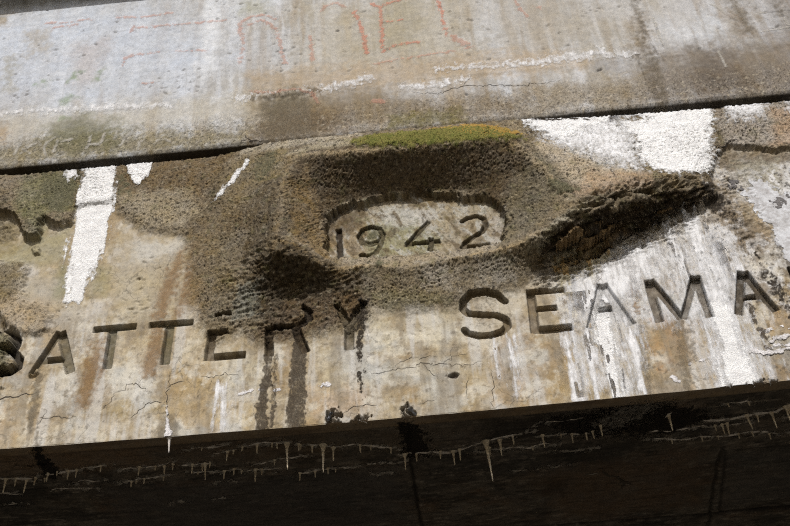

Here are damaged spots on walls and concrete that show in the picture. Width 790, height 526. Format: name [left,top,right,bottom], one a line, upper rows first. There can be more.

leakage [63,165,118,307]
leakage [126,162,153,184]
leakage [214,159,250,200]
leakage [522,103,774,402]
spalling [538,142,790,275]
leakage [751,243,790,318]
spalling [0,322,19,371]
crack [107,371,181,415]
leakage [254,341,308,430]
leakage [353,297,370,397]
crack [362,354,495,404]
leakage [0,400,790,506]